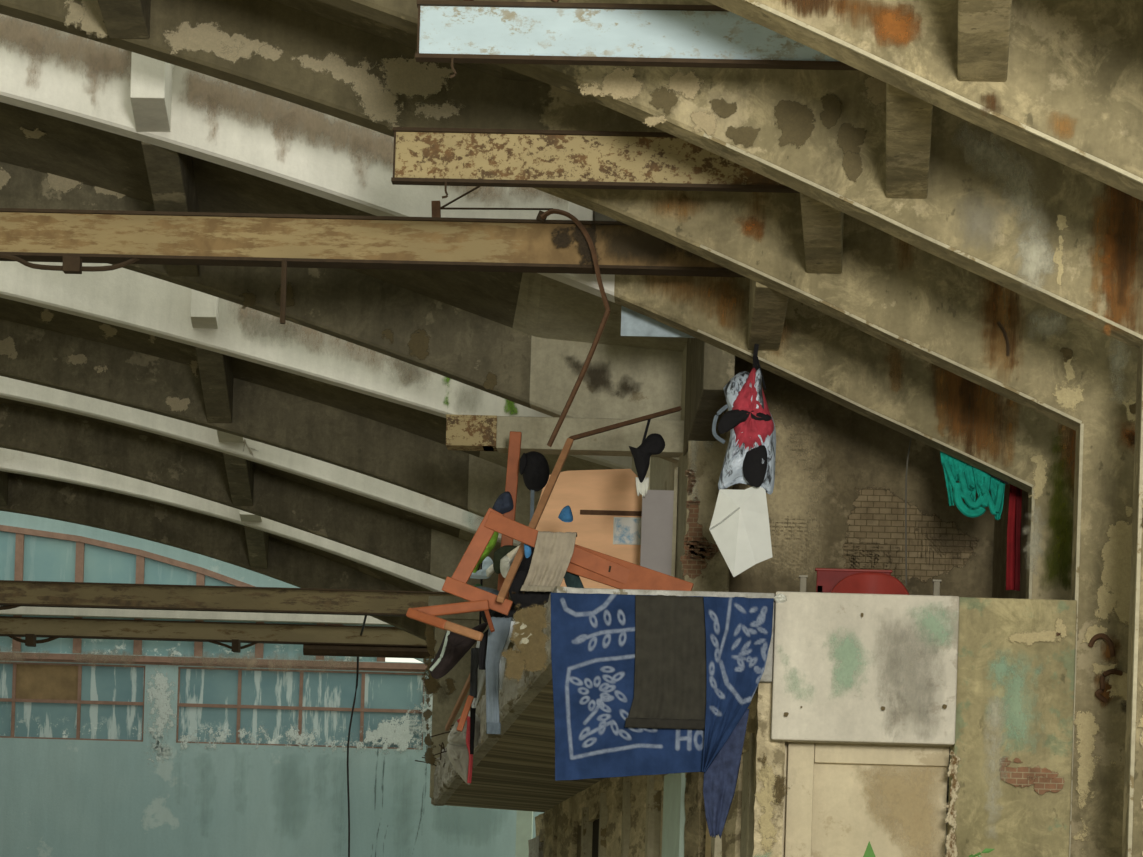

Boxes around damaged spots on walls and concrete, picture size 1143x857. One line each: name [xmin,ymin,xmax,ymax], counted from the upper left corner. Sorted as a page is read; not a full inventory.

leakage [0,14,131,93]
peeling [64,0,108,38]
leakage [186,71,394,173]
peeling [163,21,462,128]
corrosion [785,0,919,43]
leakage [457,186,500,199]
corrosion [1093,185,1143,331]
corrosion [934,365,1018,460]
corrosion [1060,425,1076,492]
leakage [1029,444,1073,586]
peeling [144,624,456,767]
spalling [999,498,1143,854]